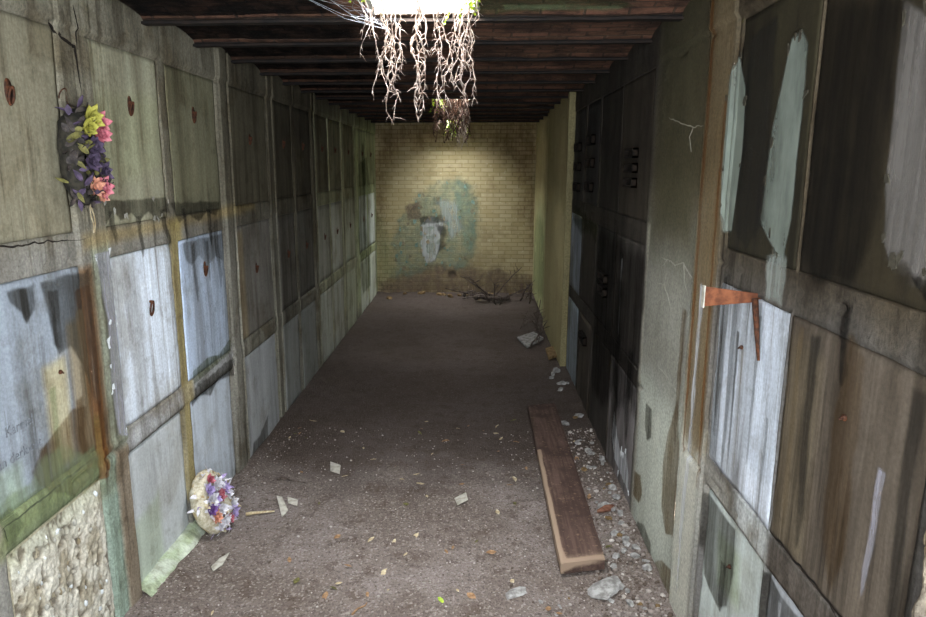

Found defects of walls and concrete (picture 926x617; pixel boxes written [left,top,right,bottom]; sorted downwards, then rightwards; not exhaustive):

peeling [394,181,476,274]
spalling [7,481,115,617]
water stain [762,573,777,617]